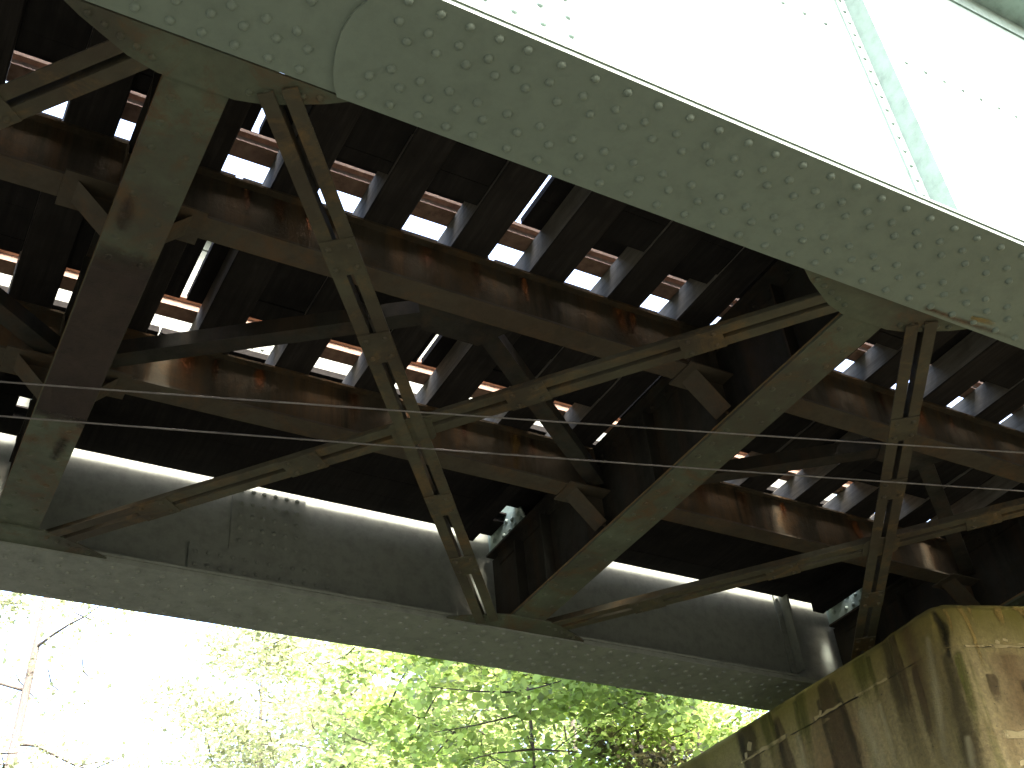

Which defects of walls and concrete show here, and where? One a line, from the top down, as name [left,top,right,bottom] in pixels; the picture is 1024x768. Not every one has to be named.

damp [768,713,796,768]
damp [818,680,860,768]
damp [889,636,930,730]
damp [1003,730,1024,739]